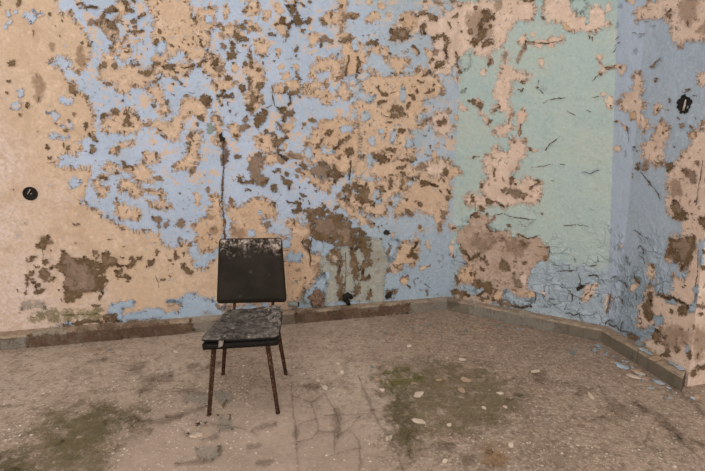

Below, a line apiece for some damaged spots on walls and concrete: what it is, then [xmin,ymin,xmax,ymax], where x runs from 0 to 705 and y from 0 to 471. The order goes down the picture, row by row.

corrosion [219,141,230,239]
peeling [0,0,705,347]
crack [534,230,648,341]